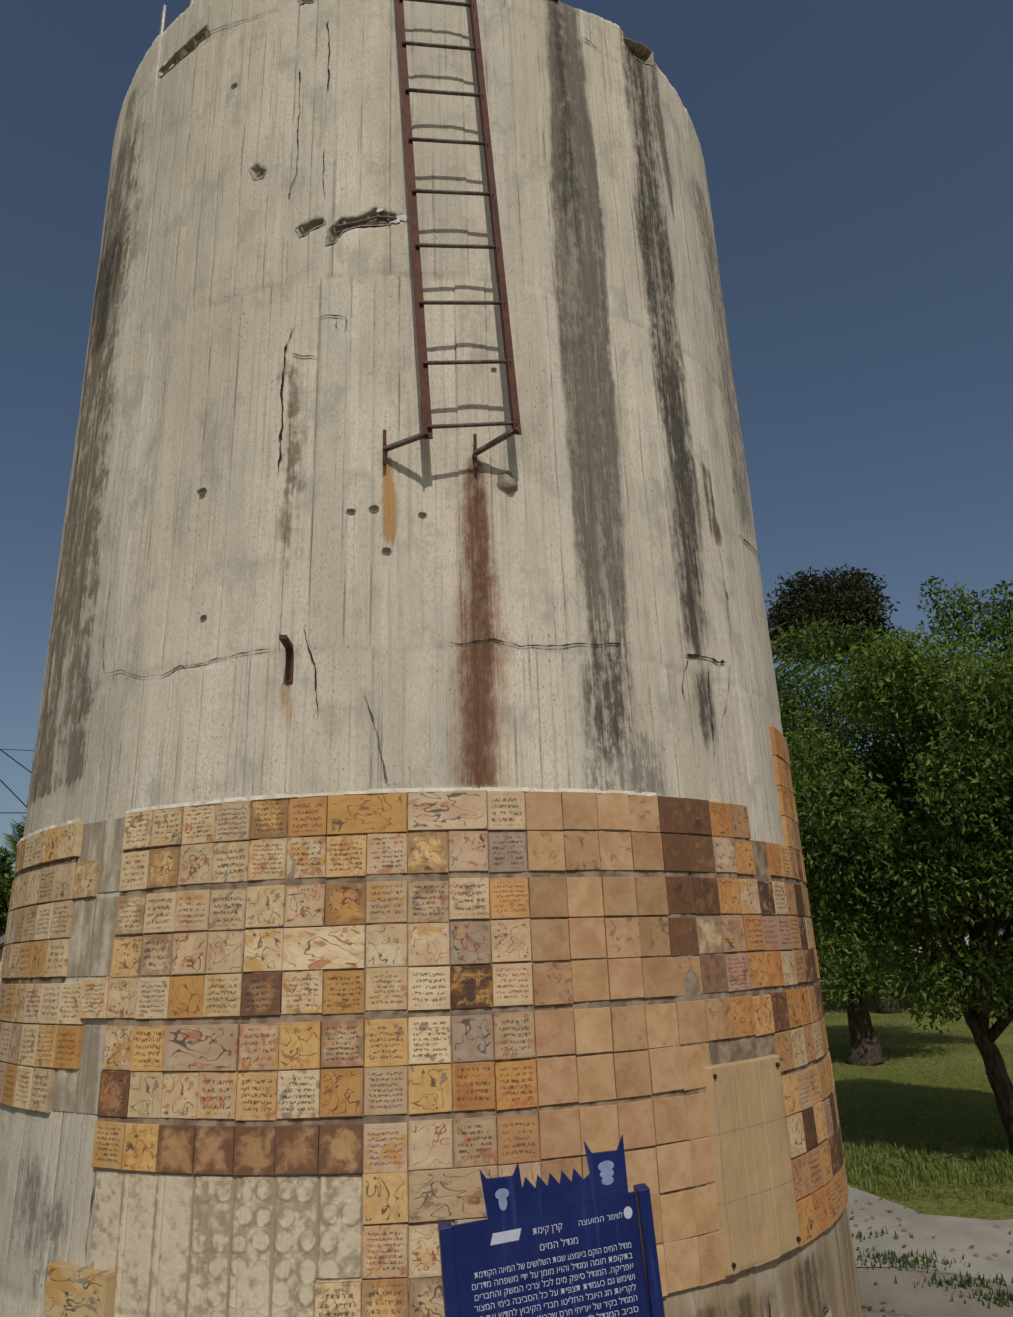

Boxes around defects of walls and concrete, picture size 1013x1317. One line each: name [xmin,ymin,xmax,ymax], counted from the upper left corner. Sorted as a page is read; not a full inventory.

spalling [157,25,211,78]
leakage [91,89,135,354]
spalling [294,206,408,245]
corrosion [383,458,396,543]
corrosion [457,459,502,786]
crack [450,638,629,647]
leakage [548,0,664,794]
leakage [623,32,721,659]
leakage [697,676,714,742]
leakage [692,178,751,533]